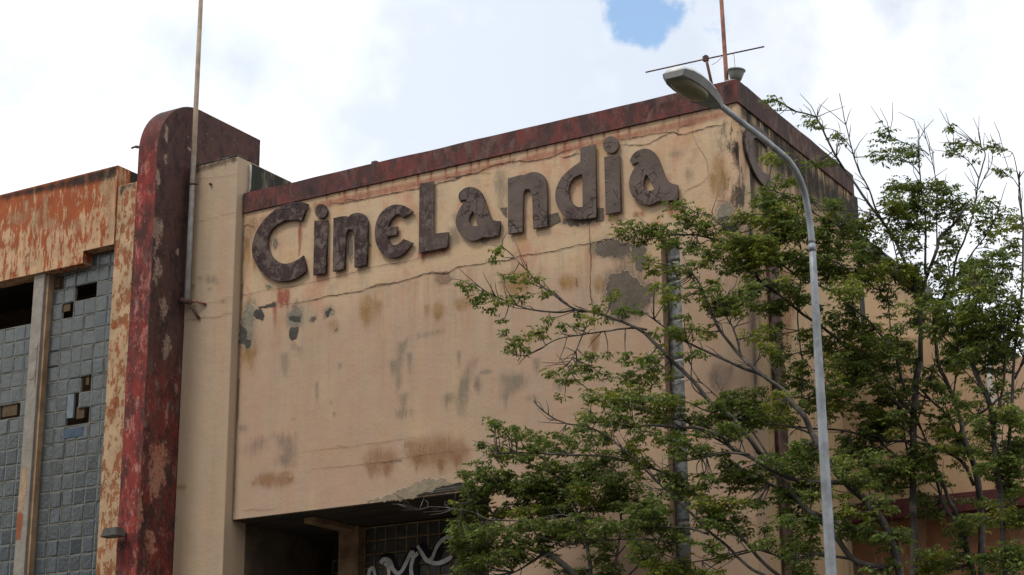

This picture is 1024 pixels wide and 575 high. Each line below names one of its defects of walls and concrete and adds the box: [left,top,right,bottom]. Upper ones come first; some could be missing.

crack [331,148,579,204]
crack [621,103,742,203]
peeling [152,216,173,360]
peeling [238,301,275,350]
peeling [287,303,335,340]
crack [184,223,631,321]
peeling [593,237,656,321]
peeling [137,439,169,561]
peeling [367,476,475,503]